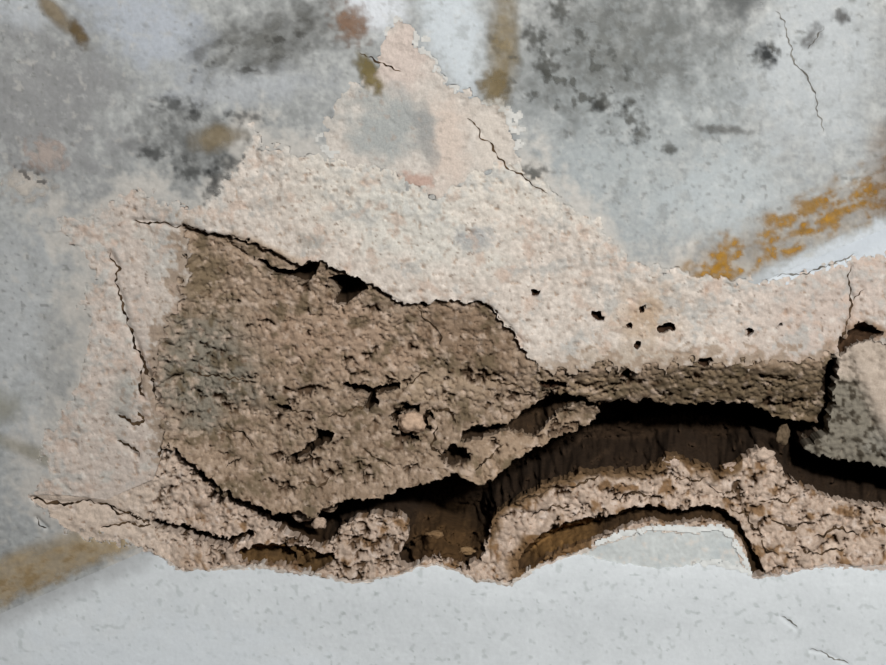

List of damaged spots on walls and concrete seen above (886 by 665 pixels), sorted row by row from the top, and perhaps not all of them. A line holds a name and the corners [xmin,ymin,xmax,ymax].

damp [165,126,233,159]
damp [195,9,320,71]
damp [338,11,367,38]
damp [357,56,382,93]
peeling [315,16,526,199]
damp [477,0,684,109]
crack [135,220,443,344]
rust [697,239,744,280]
rust [756,183,878,267]
spalling [28,122,886,587]
crack [33,253,886,574]